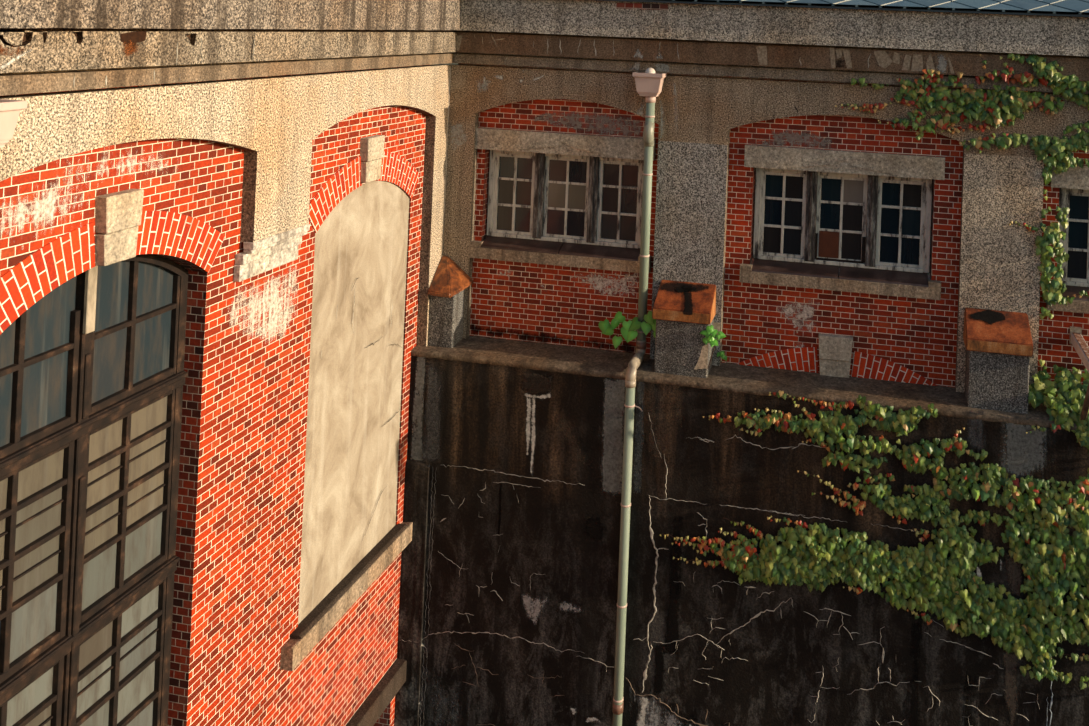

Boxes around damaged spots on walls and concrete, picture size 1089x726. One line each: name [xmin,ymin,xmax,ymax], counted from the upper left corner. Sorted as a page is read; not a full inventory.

efflorescence [231,268,297,341]
leakage [411,357,441,466]
efflorescence [525,393,550,473]
leakage [602,379,661,493]
leakage [1000,423,1047,477]
efflorescence [523,595,547,623]
leakage [637,517,691,726]
crack [410,412,1053,726]